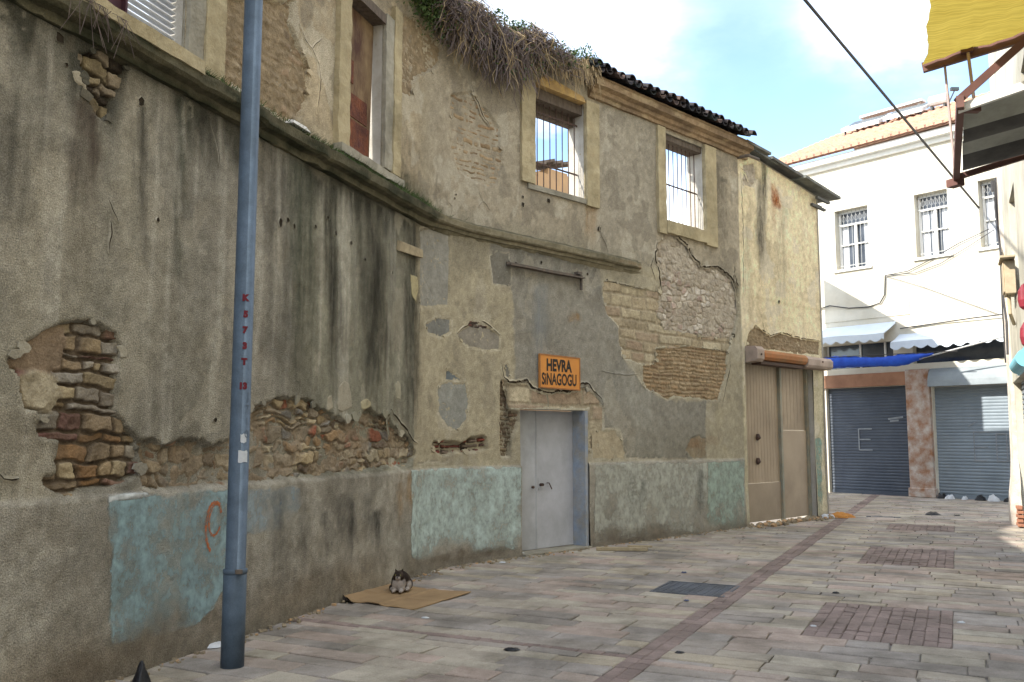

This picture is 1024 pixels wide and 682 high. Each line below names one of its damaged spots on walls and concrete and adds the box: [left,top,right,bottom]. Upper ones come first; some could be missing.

spalling [72,47,131,123]
spalling [225,0,244,89]
spalling [260,0,314,121]
damp [368,206,382,362]
peeling [410,229,499,351]
crack [500,363,635,409]
spalling [602,234,740,400]
spalling [746,326,819,355]
spalling [7,319,229,636]
spalling [247,363,602,556]